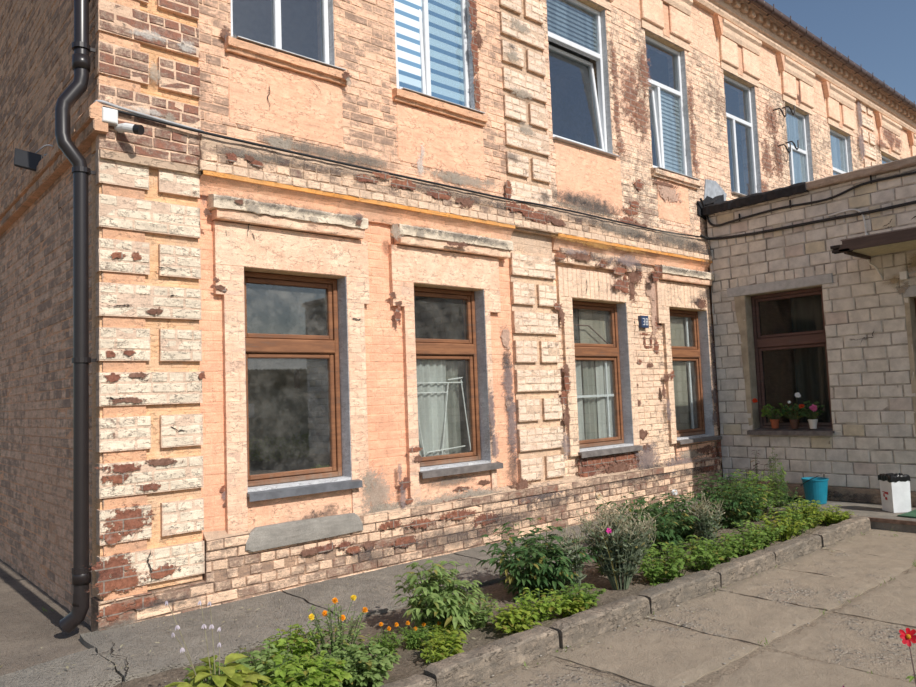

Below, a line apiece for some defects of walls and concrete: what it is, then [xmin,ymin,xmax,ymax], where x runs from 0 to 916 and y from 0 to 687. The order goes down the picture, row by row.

peeling [468,0,483,111]
peeling [610,32,653,160]
leakage [228,136,392,168]
leakage [417,146,495,189]
peeling [760,99,786,192]
leakage [559,193,643,237]
leakage [656,231,698,250]
peeling [553,251,669,368]
leakage [488,354,518,466]
peeling [97,458,183,492]
leakage [511,478,569,503]
peeling [83,501,181,630]